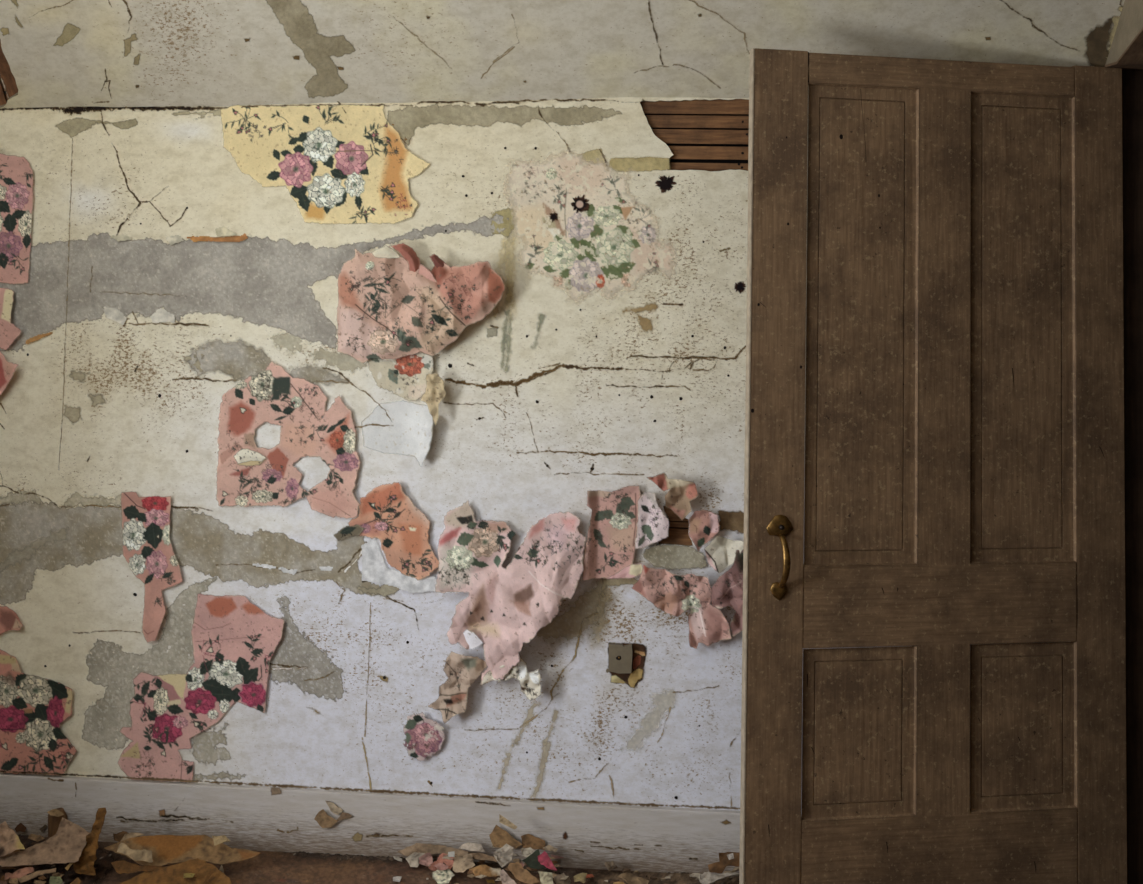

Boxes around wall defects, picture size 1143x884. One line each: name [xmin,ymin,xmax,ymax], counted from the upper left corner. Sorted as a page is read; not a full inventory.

spalling [0,0,23,108]
flaking render [266,0,355,98]
crack [1000,0,1077,50]
crack [96,69,187,236]
spalling [578,99,749,193]
crack [59,138,209,462]
flaking render [0,208,515,352]
crack [443,346,746,475]
flaking render [0,490,123,605]
flaking render [82,507,437,750]
flaking render [192,723,245,781]